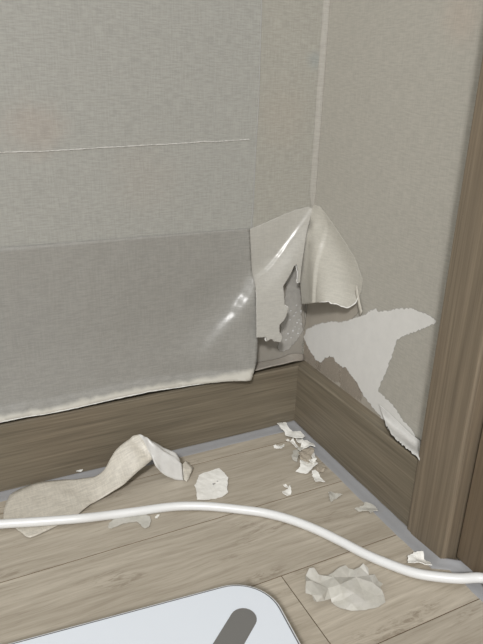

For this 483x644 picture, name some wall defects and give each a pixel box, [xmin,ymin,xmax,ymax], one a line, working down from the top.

peeling [256,285,436,437]